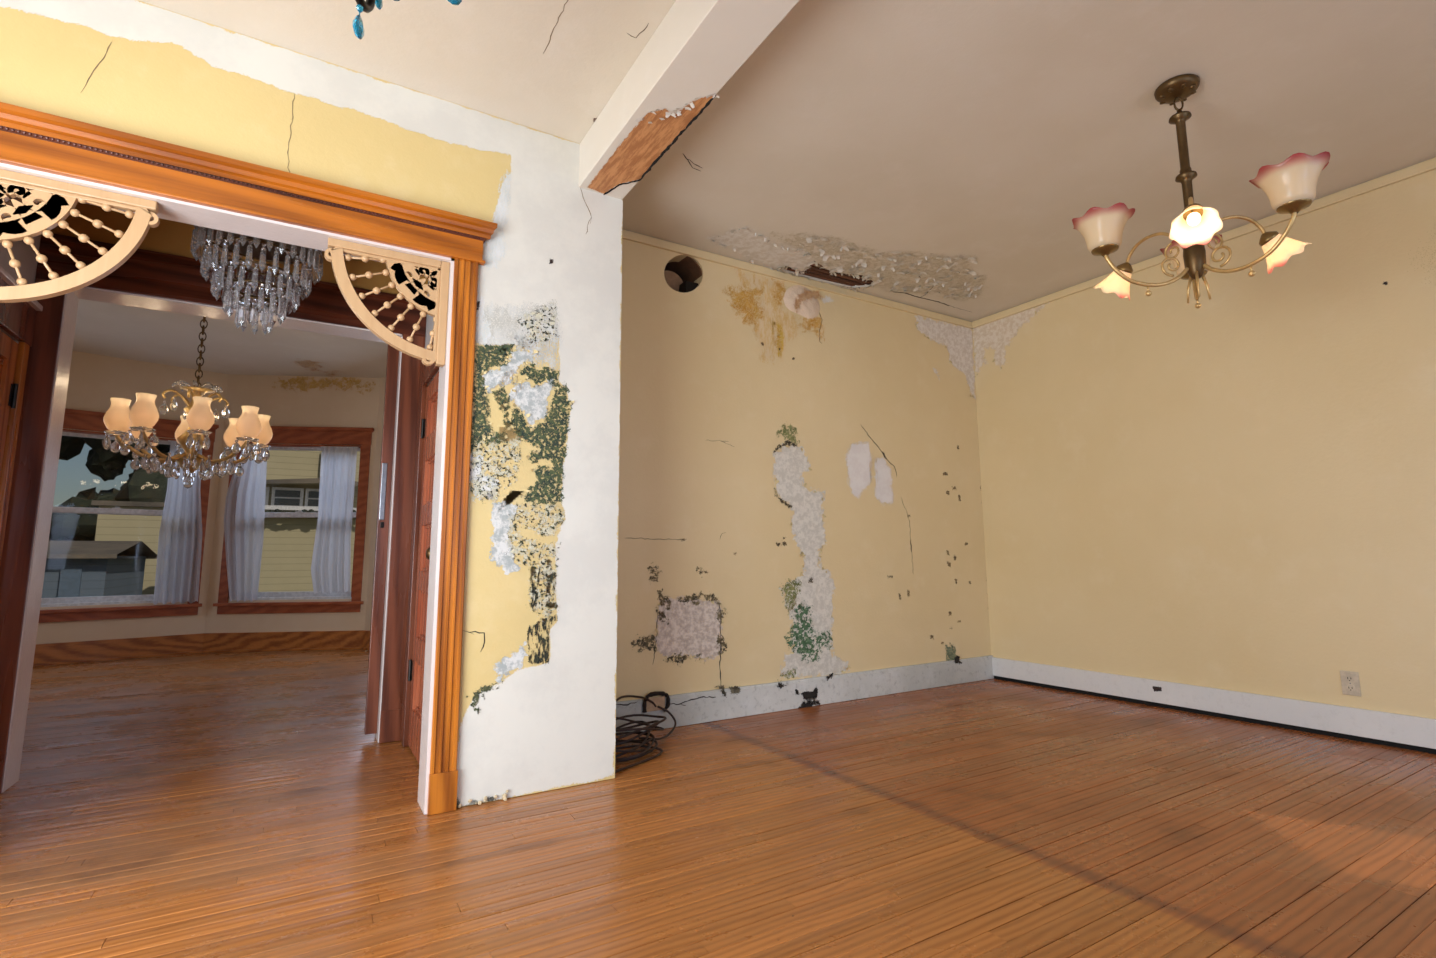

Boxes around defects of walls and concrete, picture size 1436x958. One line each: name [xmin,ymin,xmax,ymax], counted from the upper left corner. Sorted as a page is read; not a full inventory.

crack [82,42,112,91]
crack [287,95,295,173]
peeling [705,225,991,301]
water stain [724,268,827,366]
peeling [914,303,1050,400]
peeling [771,421,851,709]
peeling [631,589,727,664]